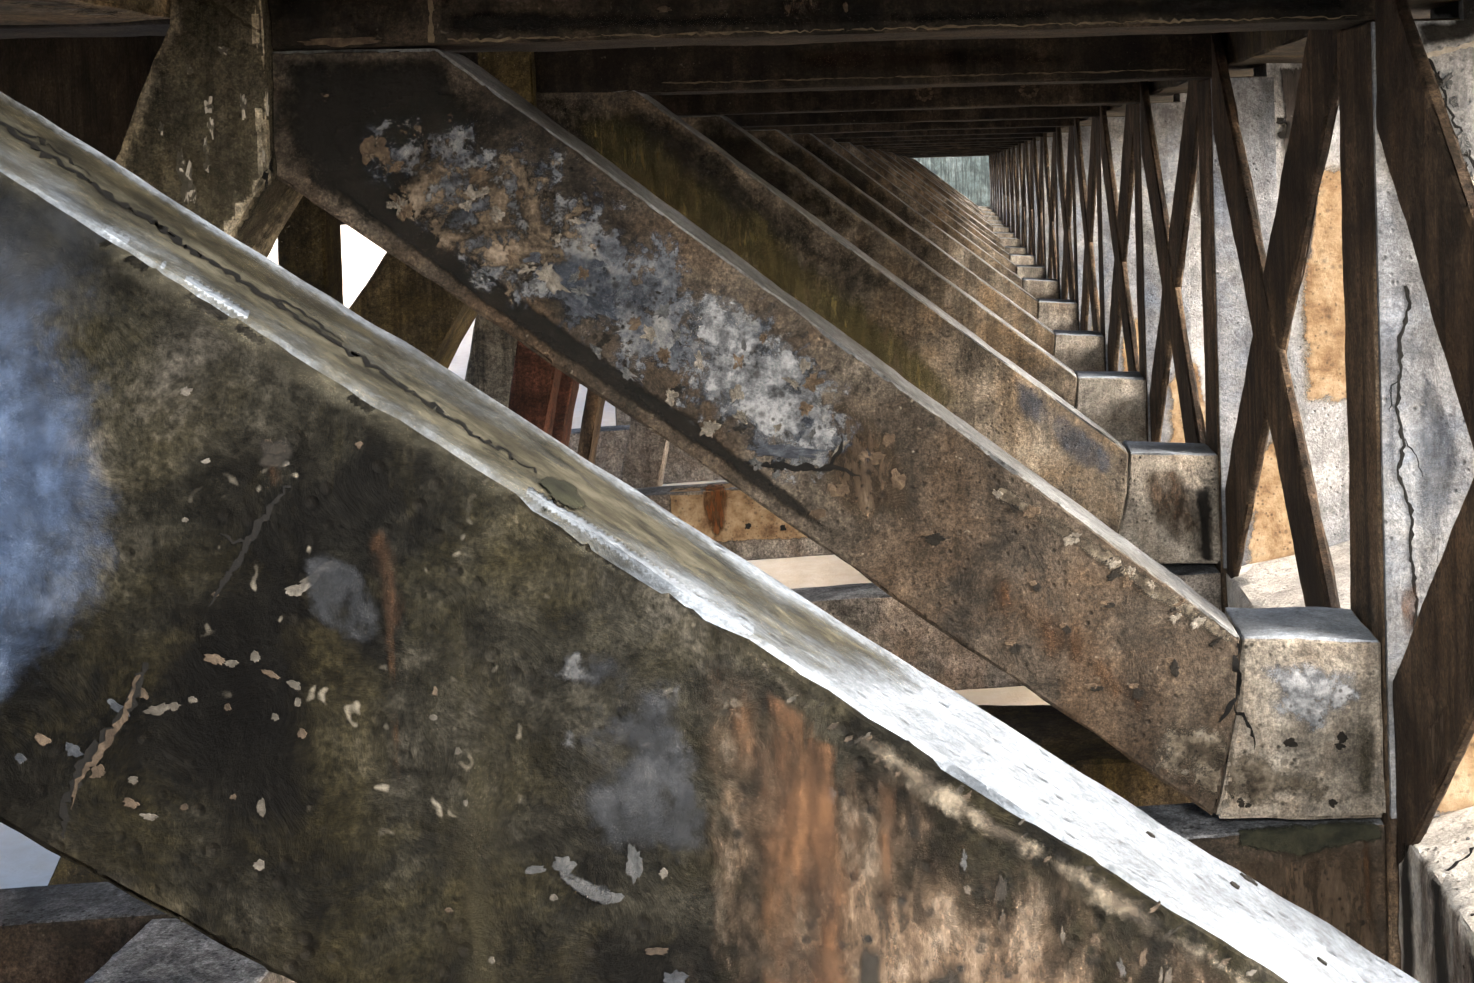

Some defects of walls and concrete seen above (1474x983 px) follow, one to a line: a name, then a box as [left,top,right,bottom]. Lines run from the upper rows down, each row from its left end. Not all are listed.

peeling [360,103,907,525]
crack [1389,285,1423,629]
peeling [284,558,377,641]
crack [1218,643,1256,750]
rust [769,700,844,983]
crack [1445,837,1474,871]